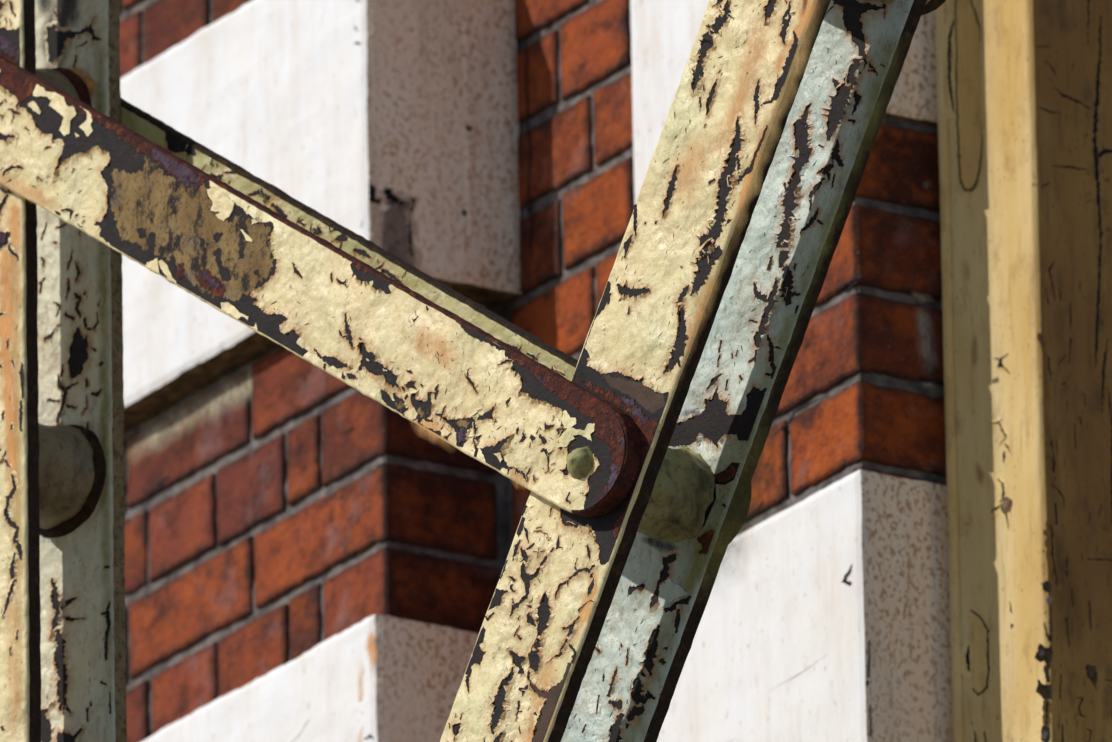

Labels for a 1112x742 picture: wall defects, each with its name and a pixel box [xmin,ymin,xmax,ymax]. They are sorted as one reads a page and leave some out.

crack [1034,41,1052,52]
rust [52,67,95,107]
peeling [624,0,897,633]
peeling [0,0,669,742]
crack [994,353,1013,379]
crack [1008,600,1016,631]
spalling [1035,581,1053,742]